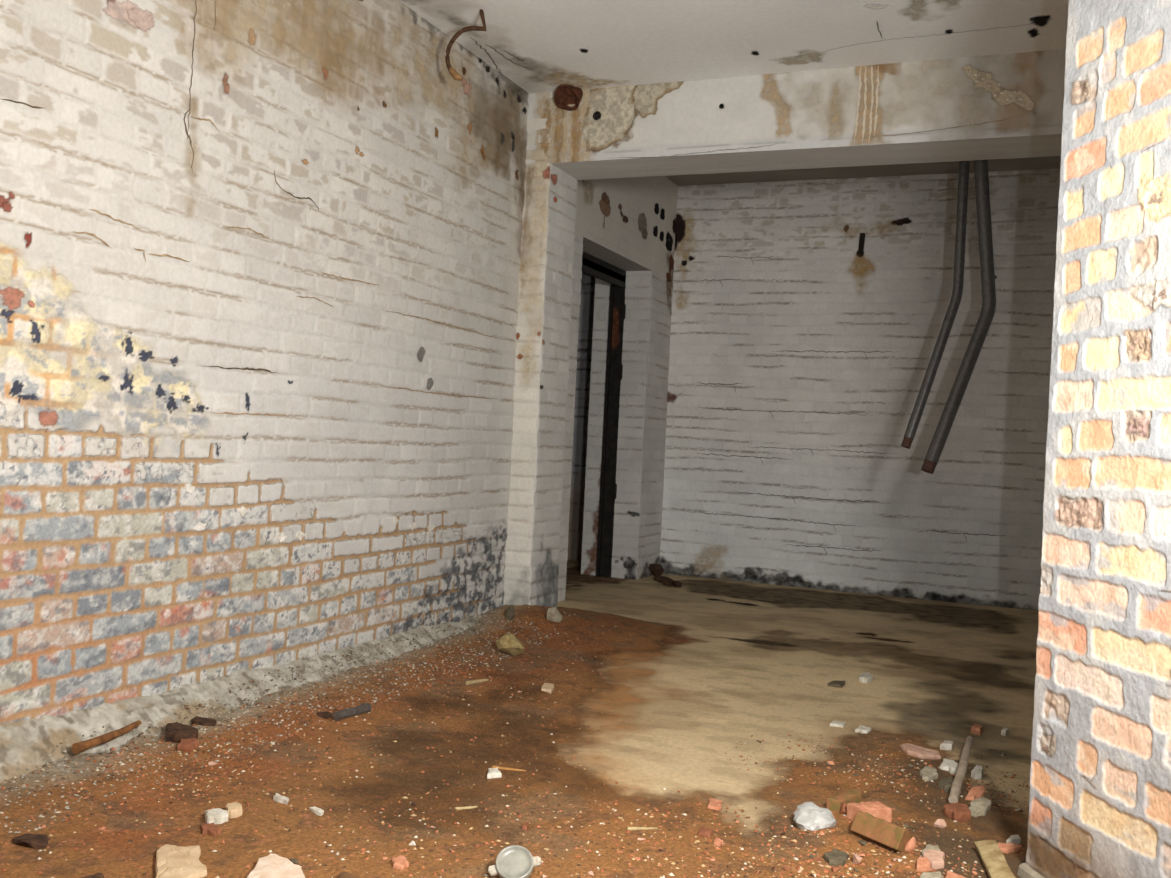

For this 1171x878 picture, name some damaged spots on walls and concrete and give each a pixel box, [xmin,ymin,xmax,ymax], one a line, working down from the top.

spalling [104,0,154,31]
crack [184,1,216,172]
leakage [392,37,612,165]
spalling [554,81,684,152]
leakage [762,74,791,134]
leakage [783,52,821,64]
leakage [853,63,903,144]
peeling [0,233,507,724]